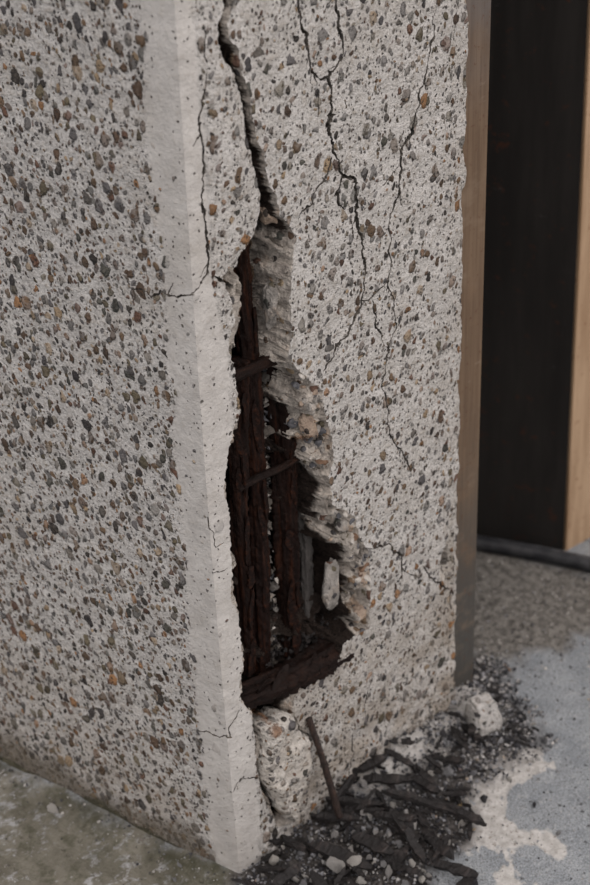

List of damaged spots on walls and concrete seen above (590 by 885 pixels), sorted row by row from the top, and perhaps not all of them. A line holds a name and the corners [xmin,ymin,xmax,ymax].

crack [129,0,437,474]
spalling [254,733,291,827]
spalling [221,207,371,751]
crack [364,543,454,610]